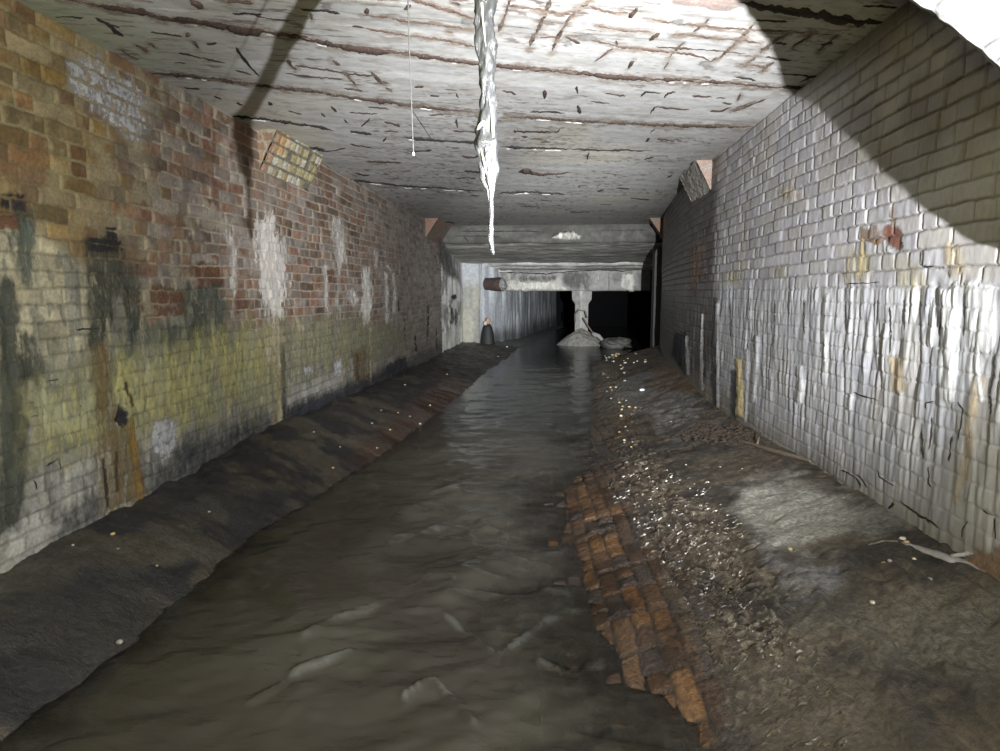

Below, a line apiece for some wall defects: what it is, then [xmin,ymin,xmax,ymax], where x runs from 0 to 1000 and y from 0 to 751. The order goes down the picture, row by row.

efflorescence [66,54,150,142]
crack [56,0,835,243]
efflorescence [224,228,239,295]
rust [92,344,145,511]
hole [115,382,134,426]
leakage [152,416,254,485]
leakage [252,210,438,423]
leakage [671,298,760,421]
leakage [889,356,906,392]
crack [921,401,971,487]
leakage [929,244,998,502]
crack [841,470,996,538]